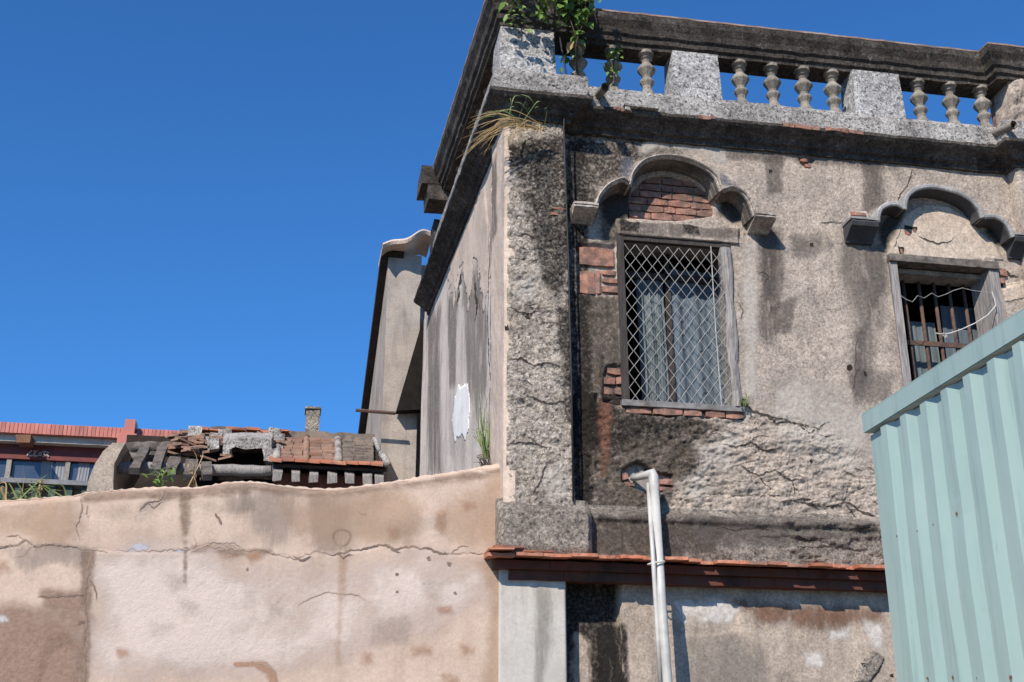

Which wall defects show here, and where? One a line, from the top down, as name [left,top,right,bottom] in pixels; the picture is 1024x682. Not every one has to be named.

flaking render [628,176,713,221]
flaking render [579,247,618,295]
crack [457,215,566,423]
damp [508,134,880,558]
peeling [452,384,470,442]
crack [508,436,551,493]
spalling [659,478,673,491]
crack [703,401,878,551]
crack [0,499,484,679]